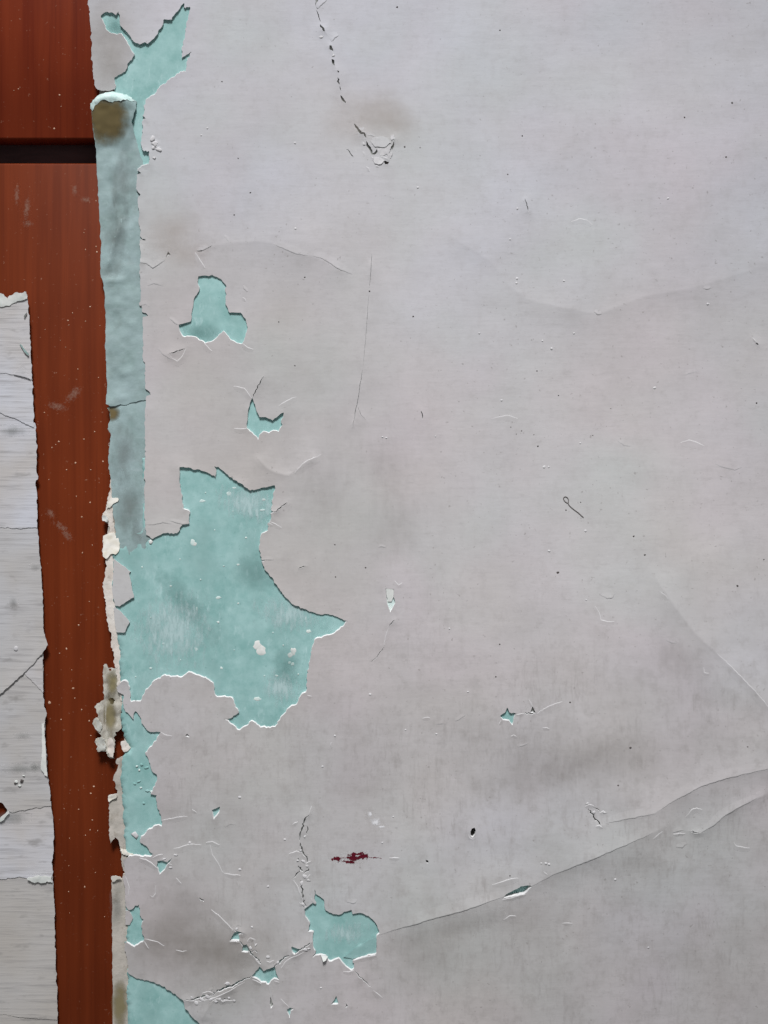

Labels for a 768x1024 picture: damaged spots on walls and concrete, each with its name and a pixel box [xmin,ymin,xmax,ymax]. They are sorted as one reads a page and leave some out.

crack [315,0,390,172]
spalling [370,135,394,165]
peeling [90,3,347,885]
crack [283,806,314,907]
crack [585,802,606,829]
peeling [126,969,199,1024]
crack [184,898,311,1009]
peeling [304,891,379,971]